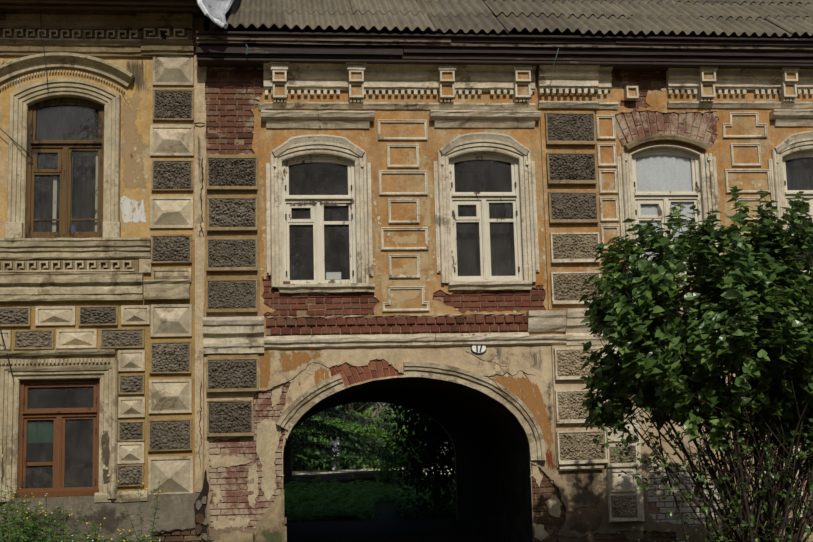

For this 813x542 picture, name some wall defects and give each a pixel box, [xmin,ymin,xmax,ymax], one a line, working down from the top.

spalling [609,71,719,148]
peeling [120,196,146,223]
spalling [261,194,547,335]
spalling [152,349,402,542]
crack [259,362,332,399]
crack [466,351,535,417]
peeling [493,376,553,451]
spalling [530,461,720,542]